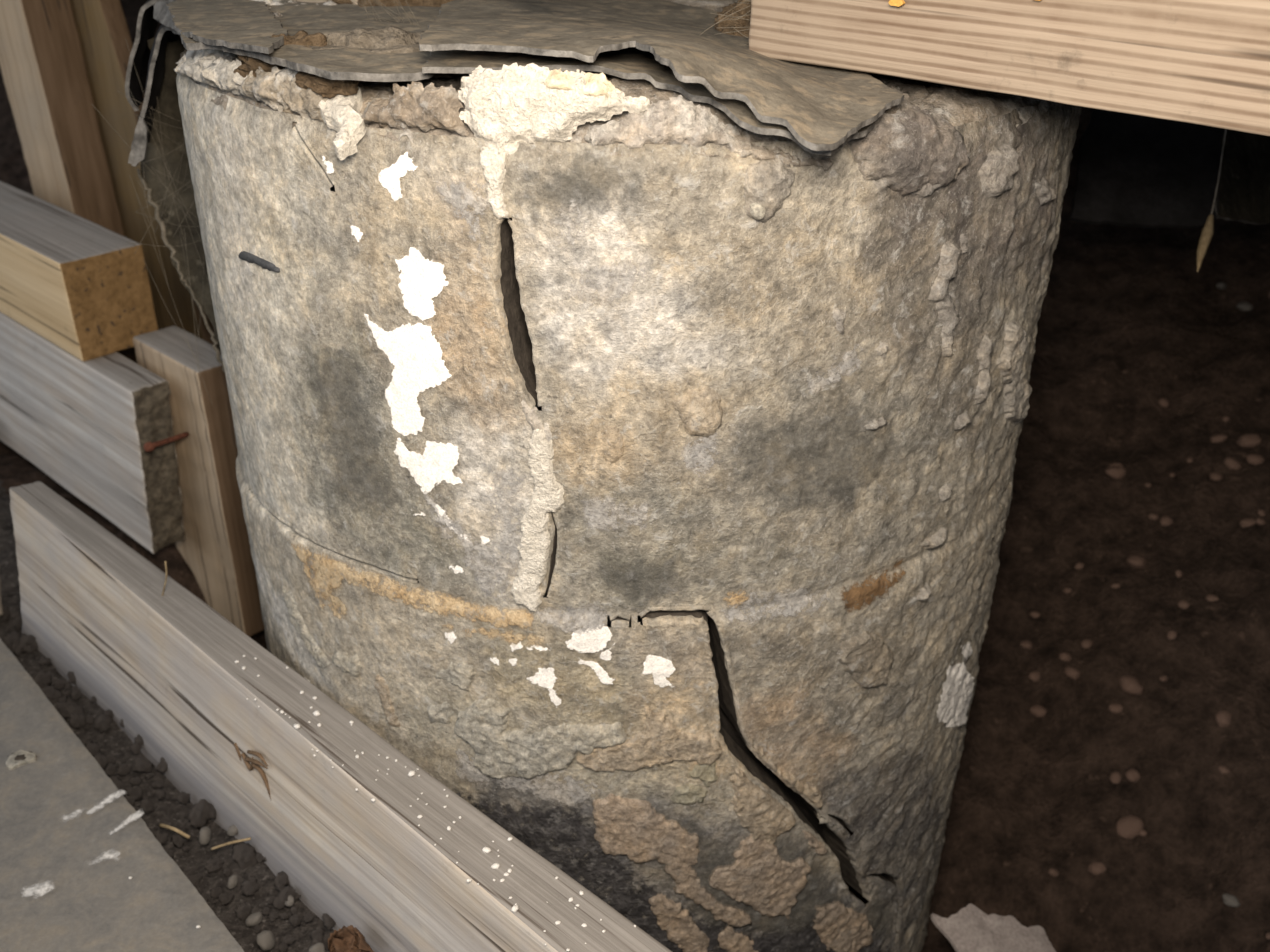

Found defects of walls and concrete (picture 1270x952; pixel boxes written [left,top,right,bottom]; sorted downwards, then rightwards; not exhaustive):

spalling [174,50,833,174]
crack [491,218,543,408]
peeling [364,247,490,545]
rust [293,545,543,646]
peeling [527,667,561,708]
crack [540,511,563,598]
peeling [565,625,615,685]
peeling [642,655,676,688]
damp [456,751,683,952]
peeling [427,698,828,952]
crack [609,605,904,952]
damp [681,824,836,952]